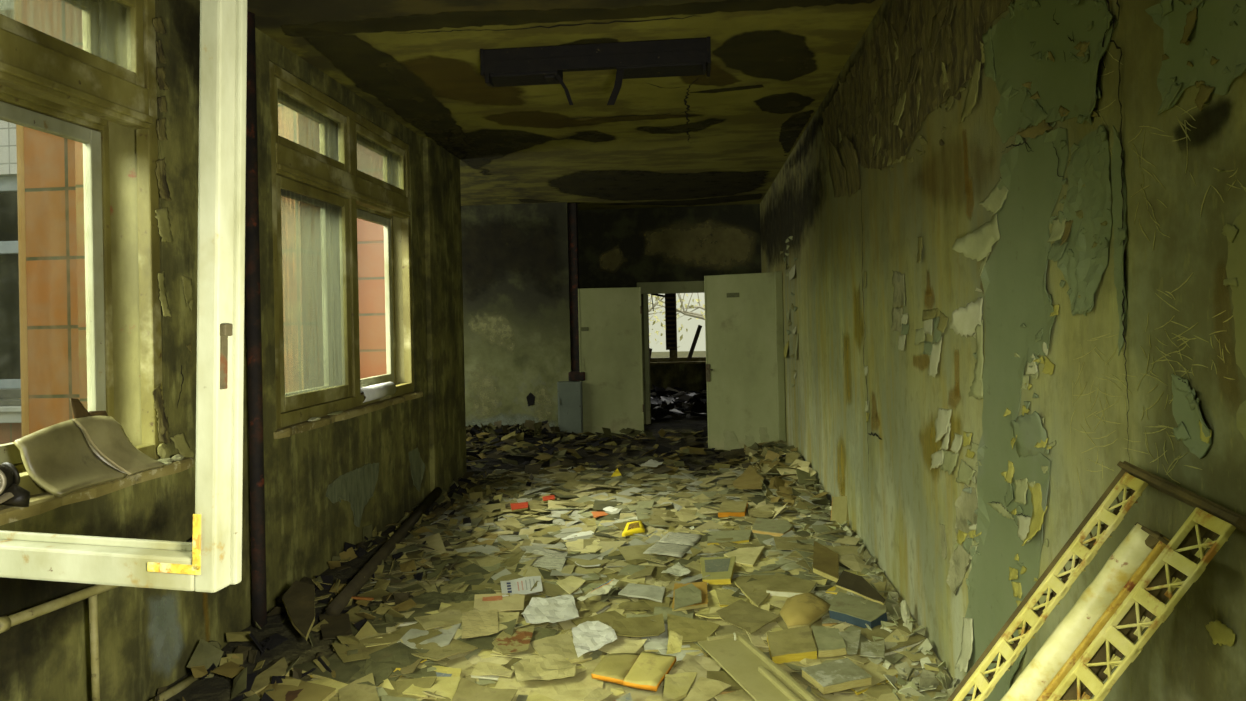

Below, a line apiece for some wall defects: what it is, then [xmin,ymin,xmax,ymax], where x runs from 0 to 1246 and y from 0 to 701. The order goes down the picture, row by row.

peeling [891,0,1128,701]
crack [1053,0,1130,461]
peeling [1171,374,1212,459]
leakage [1176,101,1231,145]